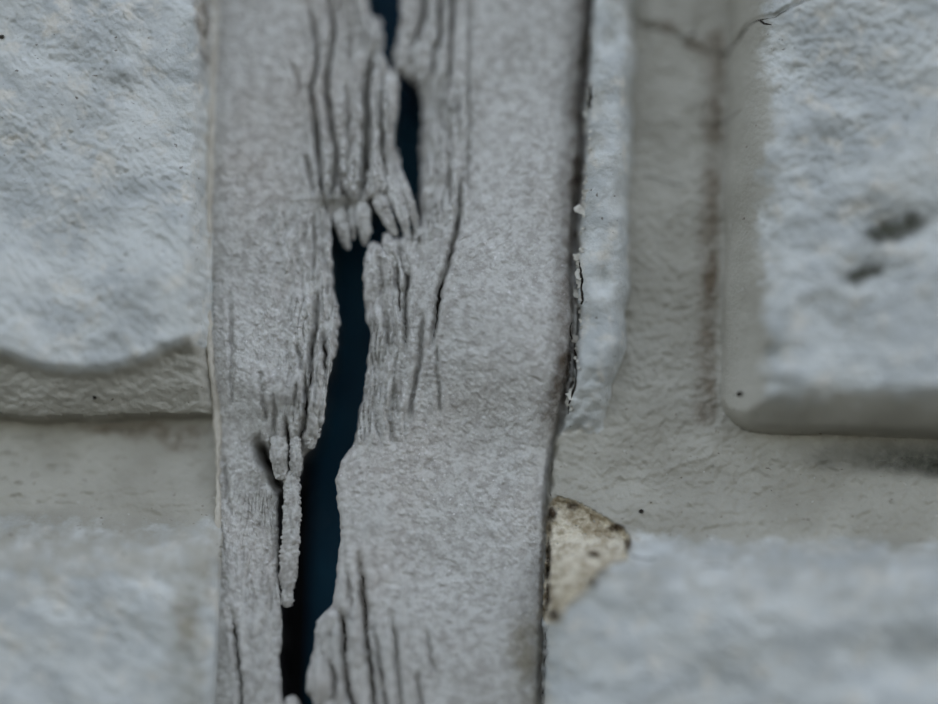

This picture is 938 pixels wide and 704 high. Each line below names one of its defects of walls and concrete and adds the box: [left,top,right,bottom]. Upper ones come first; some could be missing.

crack [630,0,806,65]
crack [434,184,461,332]
crack [260,0,454,704]
spalling [542,496,630,624]
crack [233,623,243,704]